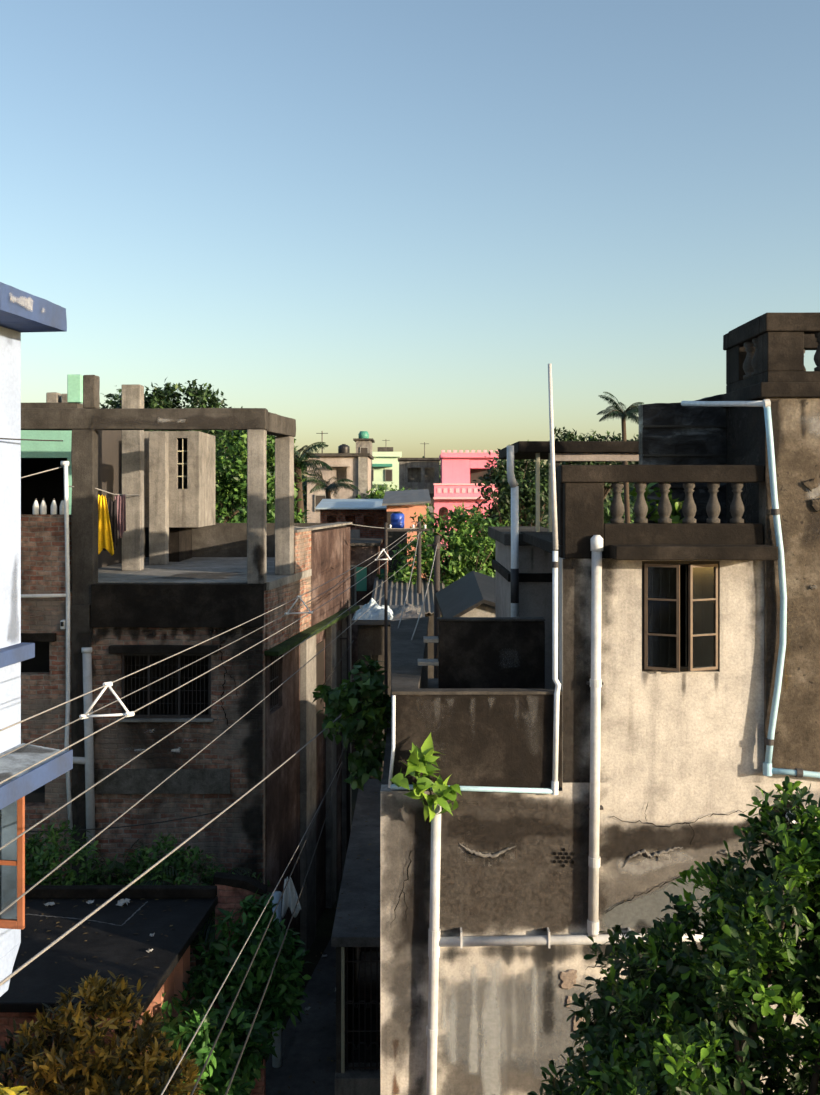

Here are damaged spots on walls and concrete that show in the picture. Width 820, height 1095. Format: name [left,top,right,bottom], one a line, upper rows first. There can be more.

flaking render [802,478,820,512]
crack [219,643,238,726]
crack [390,850,413,927]
water stain [381,559,788,1095]
crack [605,804,747,914]